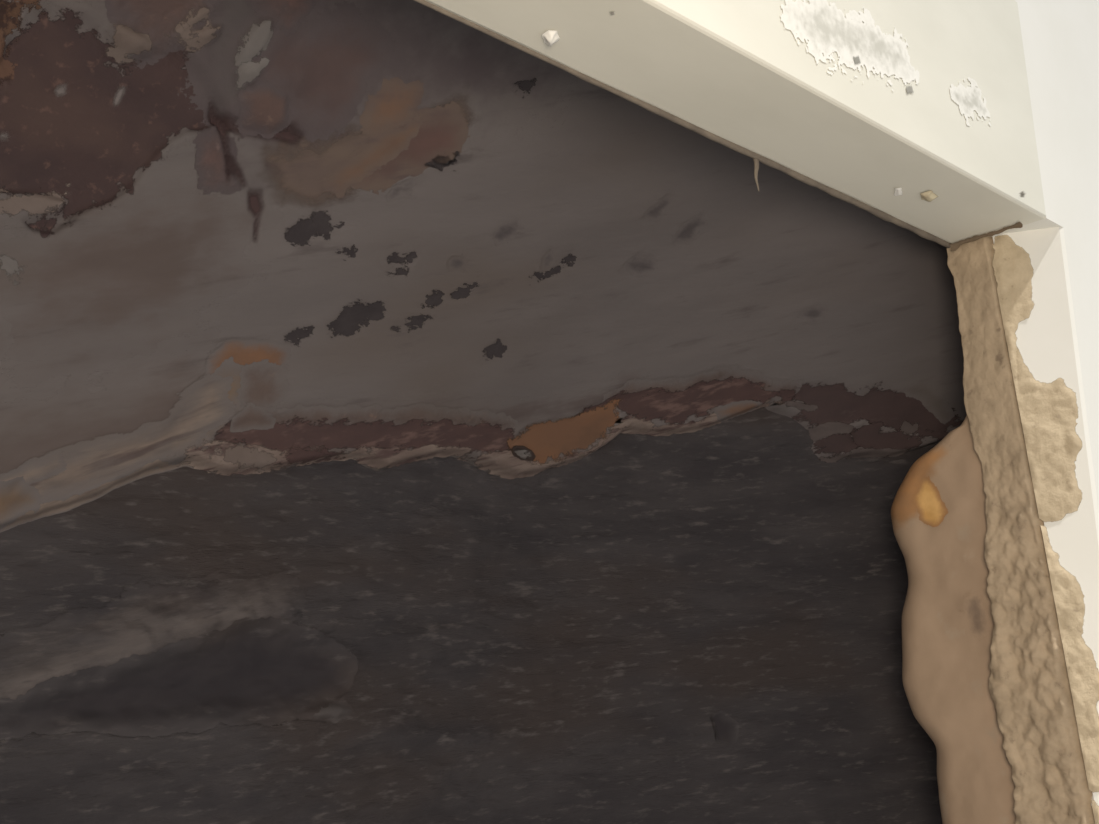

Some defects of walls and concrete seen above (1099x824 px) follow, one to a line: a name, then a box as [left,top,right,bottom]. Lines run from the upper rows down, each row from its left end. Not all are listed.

peeling [0,0,223,238]
damp [0,0,578,474]
spalling [284,210,345,247]
spalling [424,151,460,171]
spalling [0,235,1099,824]
corrosion [507,399,620,475]